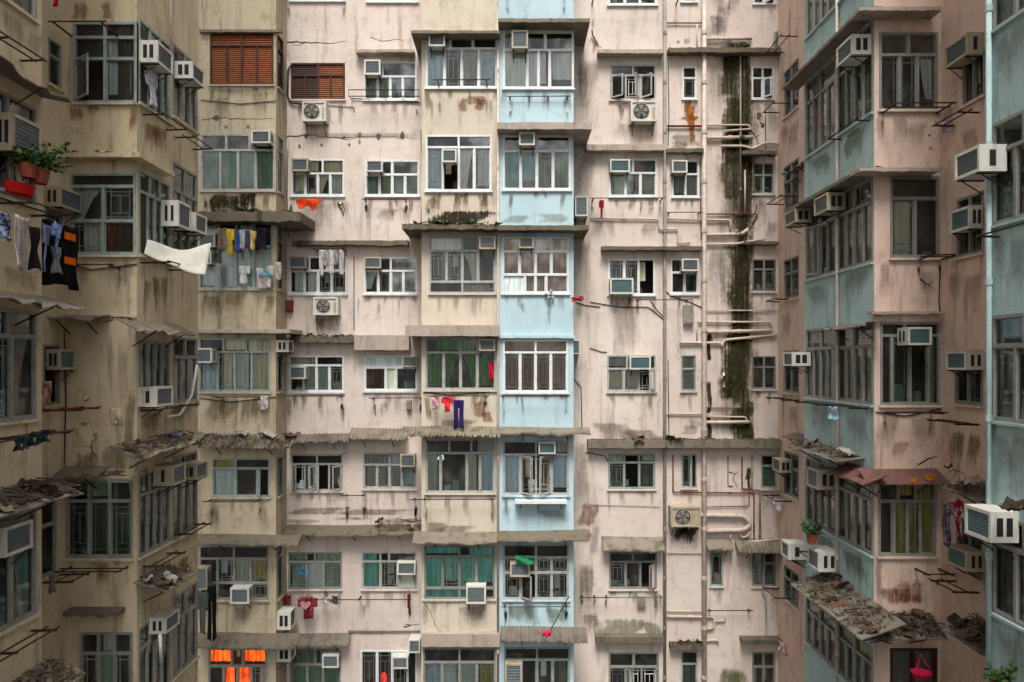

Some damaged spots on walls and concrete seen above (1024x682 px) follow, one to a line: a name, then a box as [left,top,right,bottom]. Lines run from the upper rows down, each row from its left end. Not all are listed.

rust [682,101,698,138]
damp [427,210,494,225]
damp [707,44,755,439]